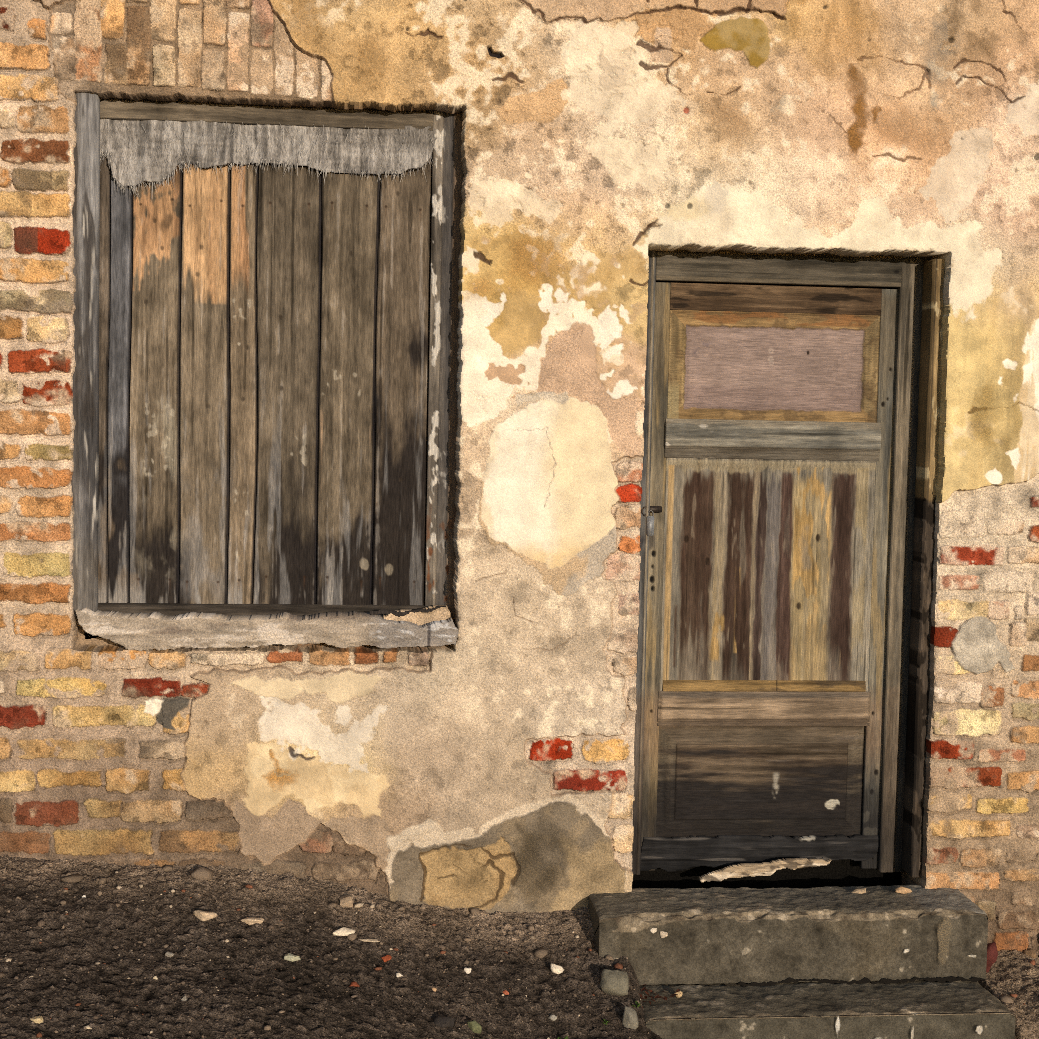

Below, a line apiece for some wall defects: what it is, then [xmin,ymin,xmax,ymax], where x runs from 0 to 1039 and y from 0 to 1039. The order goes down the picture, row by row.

crack [405,29,444,40]
crack [521,0,788,97]
crack [1002,0,1023,30]
crack [492,72,524,84]
peeling [560,8,771,192]
crack [829,115,847,134]
crack [857,55,1026,104]
peeling [1006,84,1039,136]
crack [872,153,922,163]
spalling [0,0,434,900]
spalling [460,127,1039,957]
spalling [420,837,518,911]